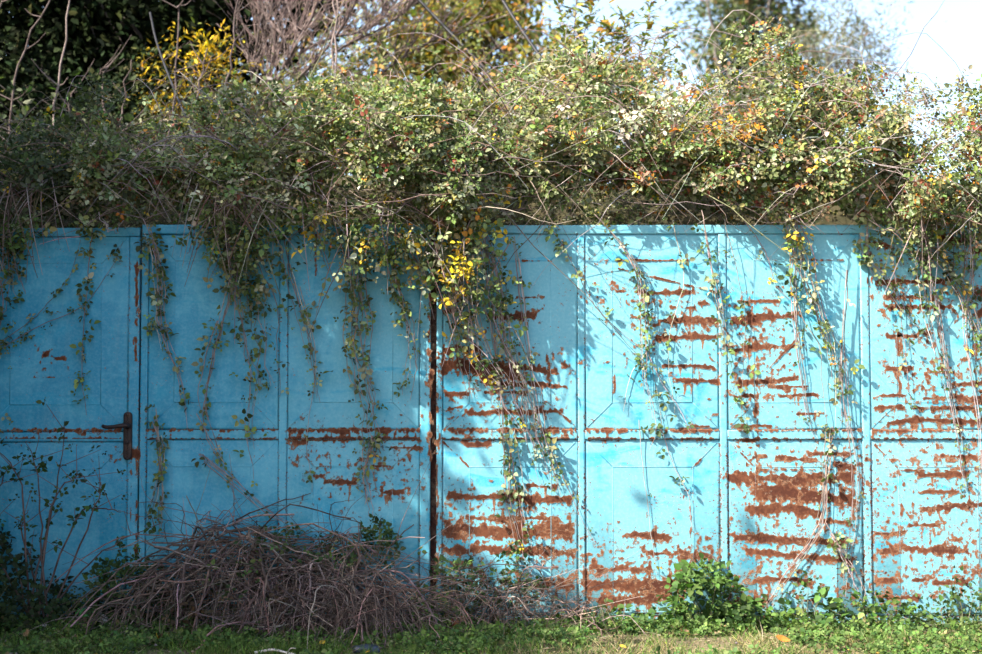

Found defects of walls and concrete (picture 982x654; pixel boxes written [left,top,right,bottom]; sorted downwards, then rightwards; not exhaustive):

corrosion [33,344,69,378]
corrosion [0,427,122,446]
corrosion [115,233,982,618]